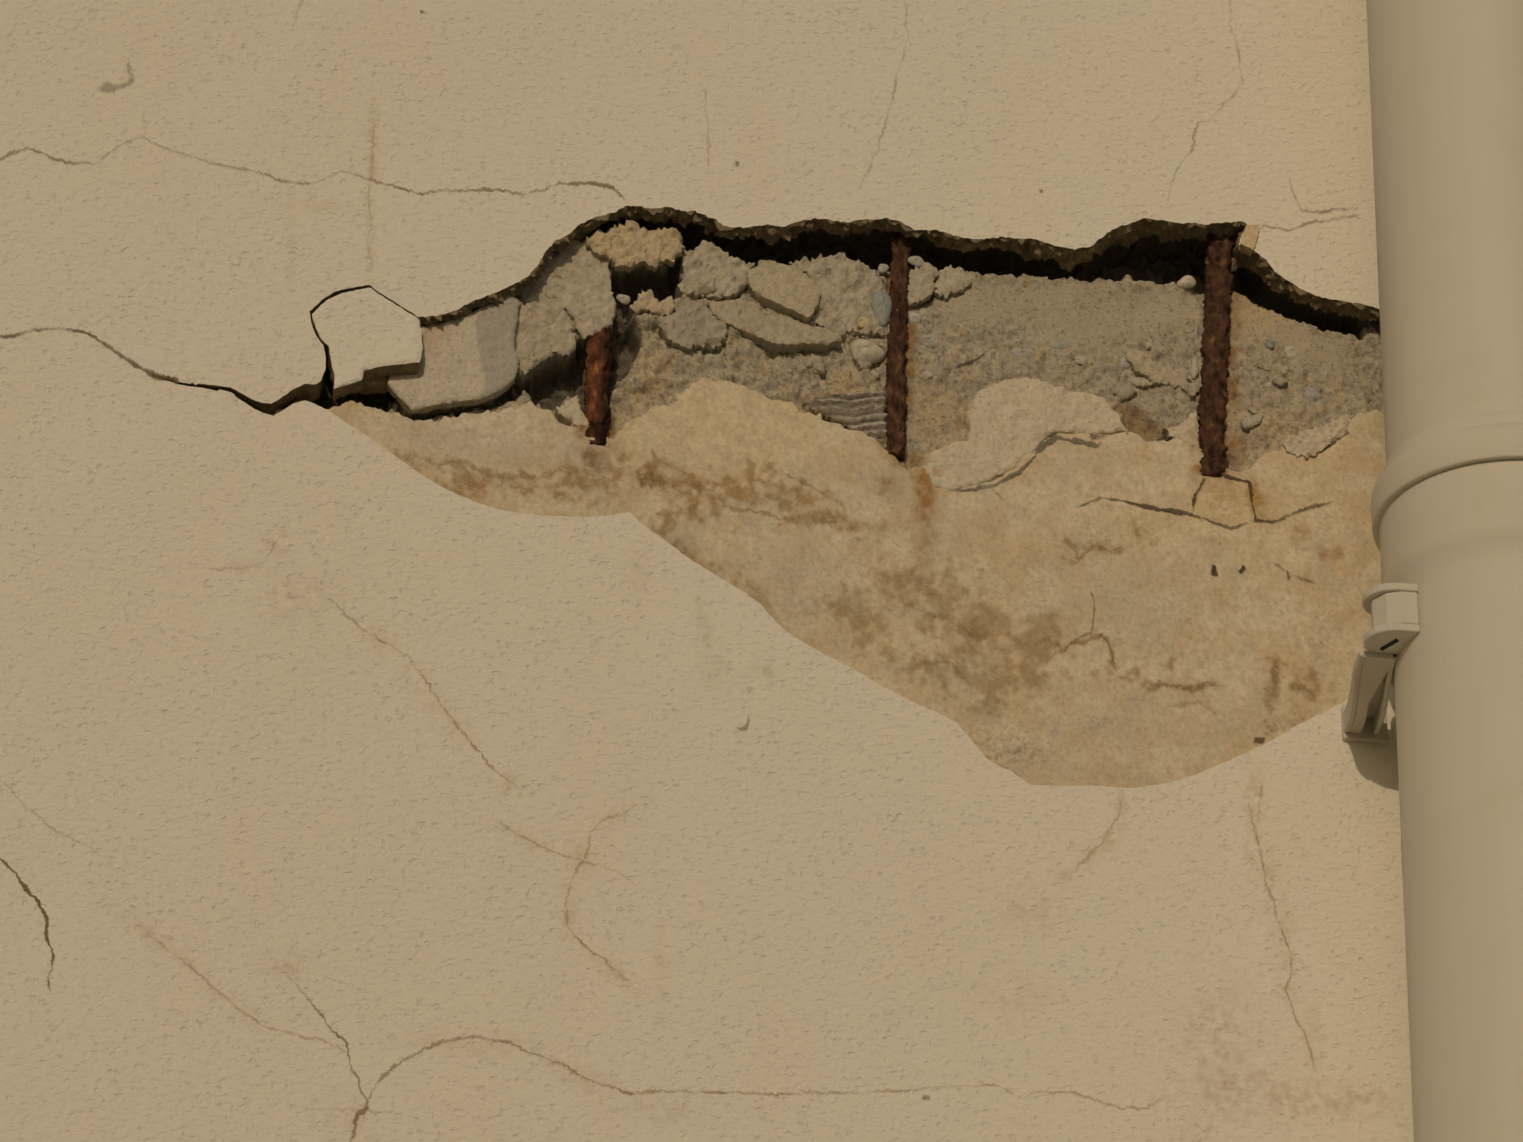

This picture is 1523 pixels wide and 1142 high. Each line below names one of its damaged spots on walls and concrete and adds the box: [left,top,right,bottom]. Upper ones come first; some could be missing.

crack [0,148,75,163]
crack [371,178,623,196]
crack [0,328,179,383]
spalling [163,205,1386,788]
crack [0,858,55,986]
crack [314,1006,434,1137]